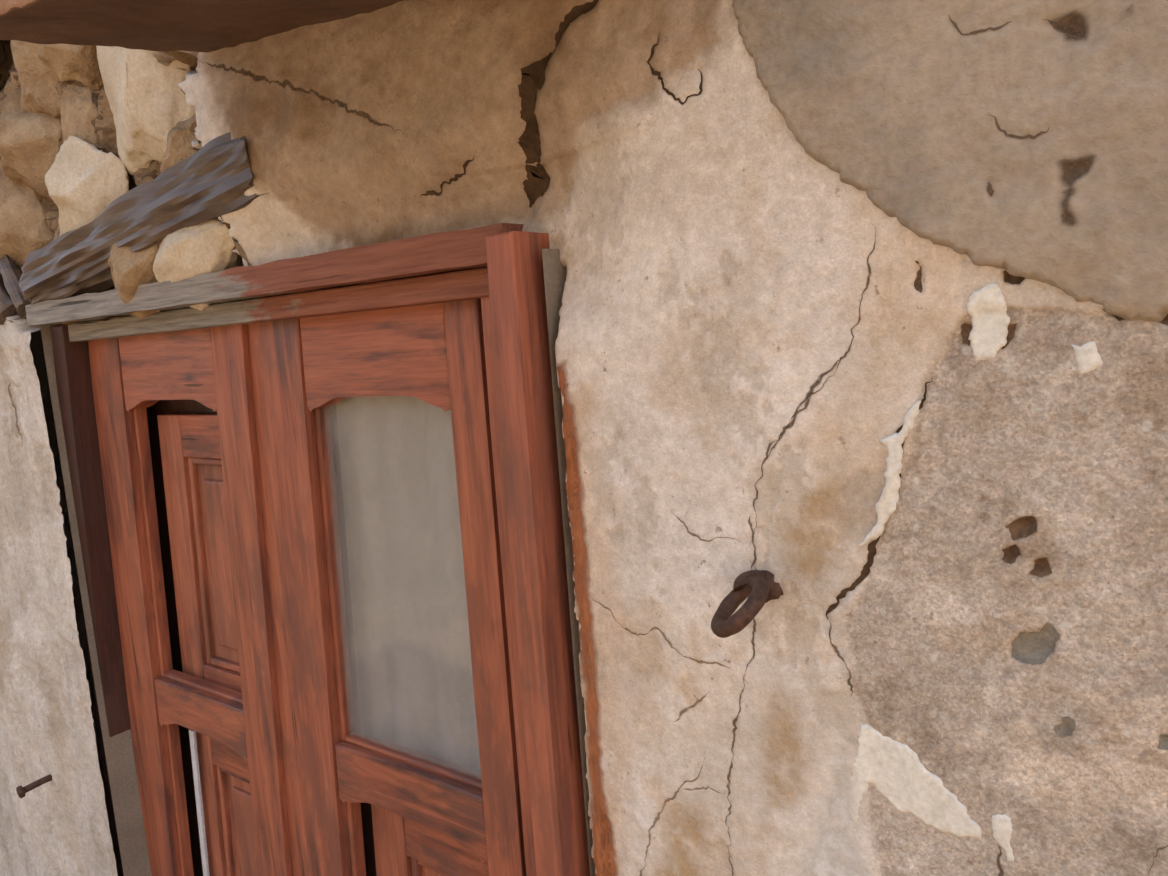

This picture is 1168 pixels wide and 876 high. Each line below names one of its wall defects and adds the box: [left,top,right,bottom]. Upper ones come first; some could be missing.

spalling [0,40,21,114]
crack [518,0,598,208]
crack [647,33,703,105]
spalling [128,160,161,191]
crack [671,228,876,570]
crack [896,377,932,478]
crack [826,536,880,696]
hole [1002,516,1037,564]
hole [1011,623,1060,665]
hole [1030,558,1052,577]
crack [594,600,756,876]
peeling [848,724,1014,863]